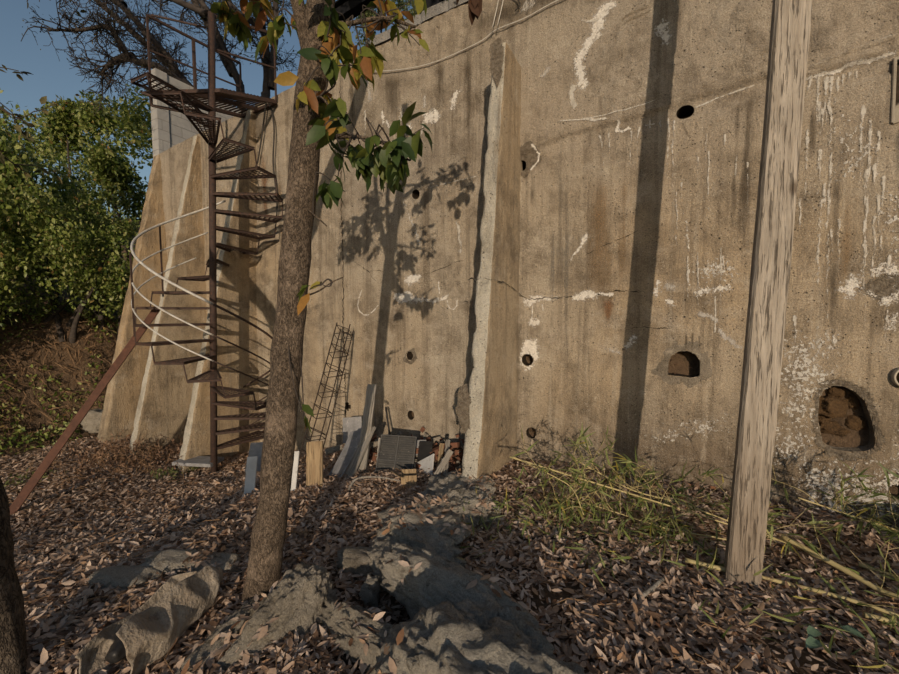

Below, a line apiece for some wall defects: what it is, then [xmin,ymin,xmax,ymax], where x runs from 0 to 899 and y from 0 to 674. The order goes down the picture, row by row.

crack [433,261,572,300]
leakage [806,50,899,337]
leakage [773,315,899,526]
spalling [812,379,886,461]